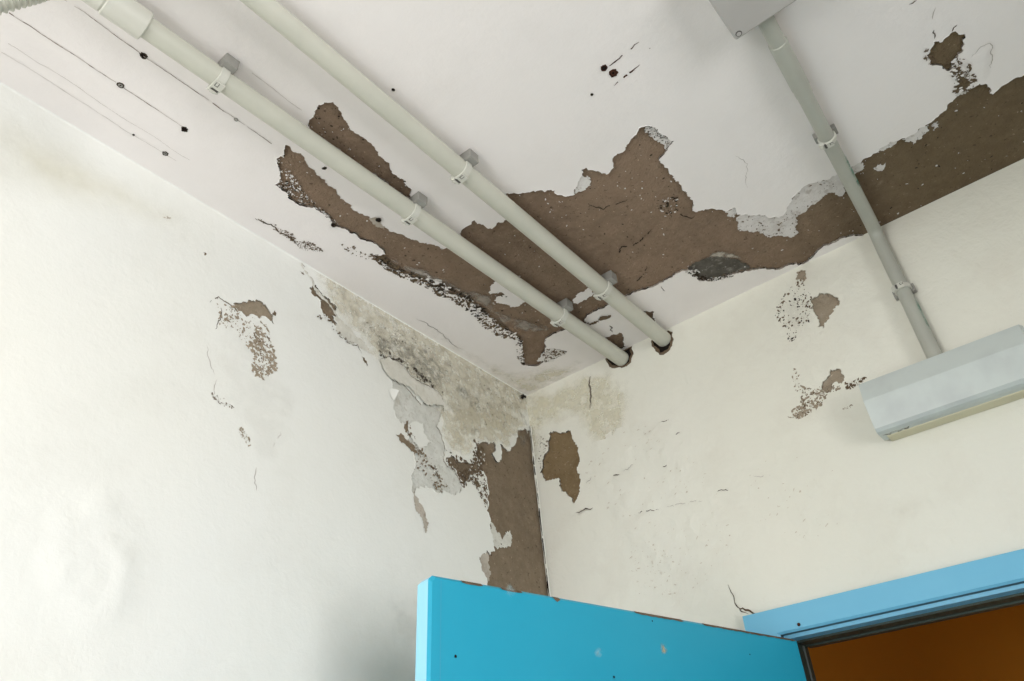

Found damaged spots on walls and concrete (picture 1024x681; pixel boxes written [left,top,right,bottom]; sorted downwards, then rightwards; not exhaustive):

peeling [307,101,413,198]
peeling [851,25,1024,226]
peeling [211,296,278,380]
peeling [275,145,567,366]
leakage [341,290,559,439]
peeling [459,219,633,368]
spalling [651,330,674,355]
peeling [505,125,868,341]
peeling [789,368,867,419]
peeling [389,379,581,602]
crack [728,585,754,614]